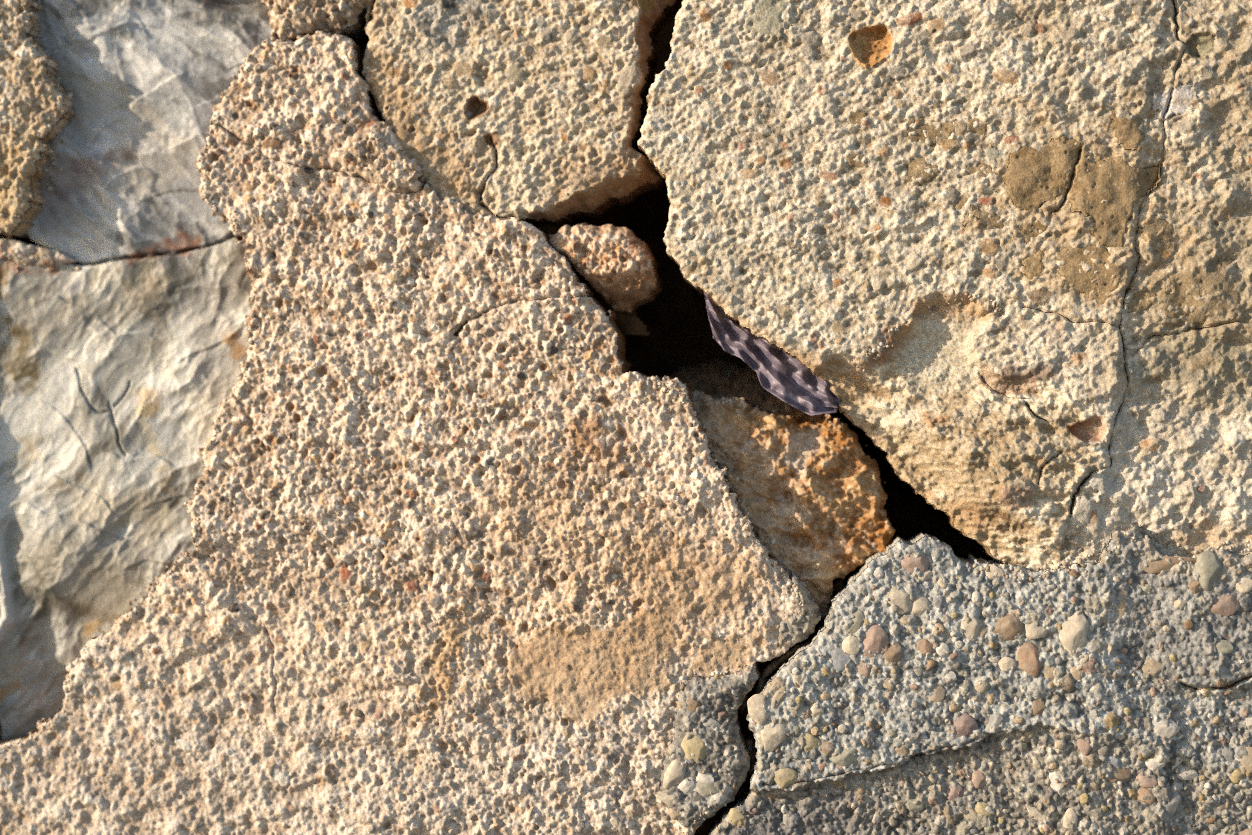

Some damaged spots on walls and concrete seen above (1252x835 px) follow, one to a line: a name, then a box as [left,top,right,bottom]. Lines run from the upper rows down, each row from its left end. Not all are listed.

crack [646,0,683,107]
crack [453,138,748,378]
crack [1022,0,1251,518]
crack [979,373,1050,423]
crack [809,405,995,638]
crack [740,657,776,737]
crack [1180,675,1252,690]
crack [695,763,898,835]